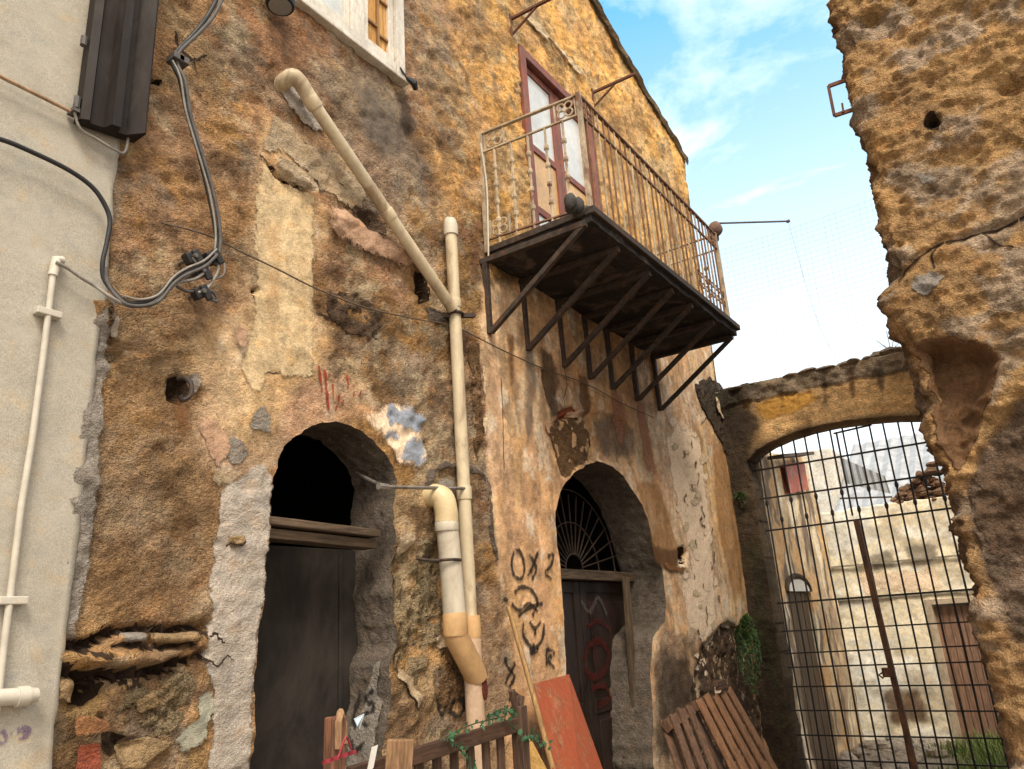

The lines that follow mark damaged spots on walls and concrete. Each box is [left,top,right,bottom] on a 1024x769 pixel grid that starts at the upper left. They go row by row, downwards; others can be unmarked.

leakage [401,99,412,131]
peeling [235,86,387,393]
crack [900,216,1024,279]
peeling [66,300,120,641]
peeling [368,403,426,466]
flaking render [546,407,591,478]
peeling [228,535,246,546]
peeling [664,416,762,769]
crack [59,620,234,703]